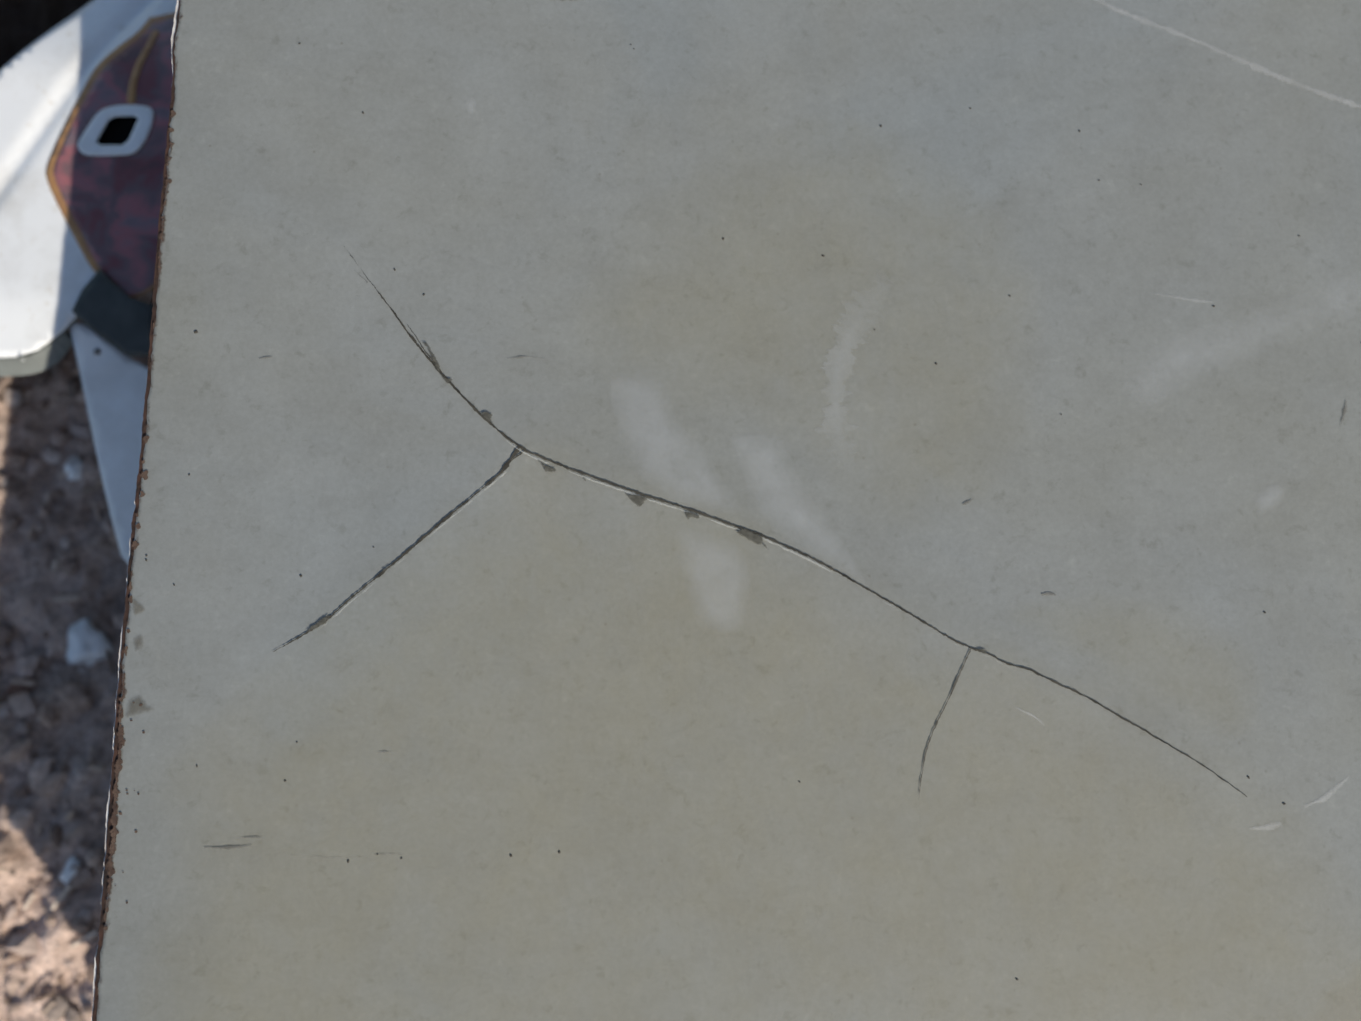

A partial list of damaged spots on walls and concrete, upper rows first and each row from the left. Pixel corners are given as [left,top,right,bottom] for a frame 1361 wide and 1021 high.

crack [273,255,1247,797]